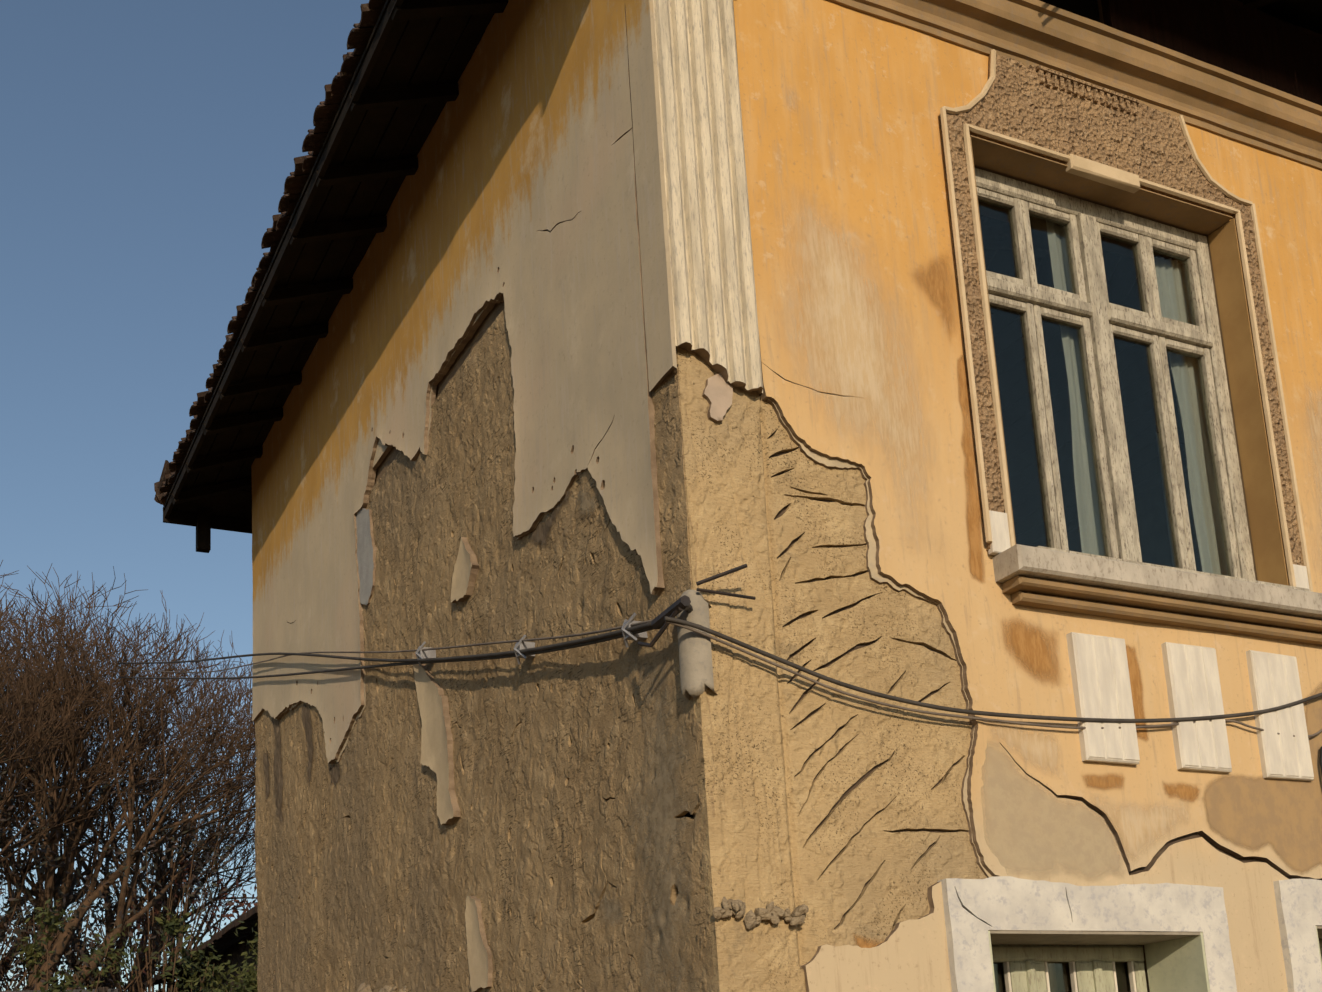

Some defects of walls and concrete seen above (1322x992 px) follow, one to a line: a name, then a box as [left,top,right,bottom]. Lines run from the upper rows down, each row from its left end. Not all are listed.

peeling [800,215,919,496]
flaking render [255,307,987,992]
leakage [263,718,283,823]
leakage [302,704,313,785]
crack [1057,797,1110,830]
crack [1128,832,1321,880]